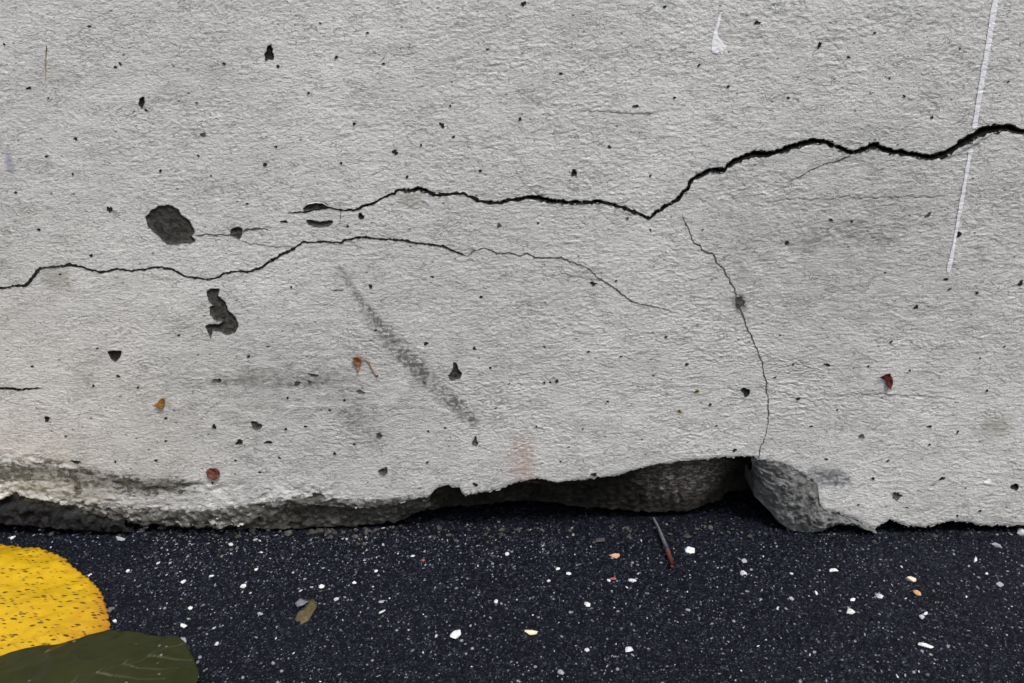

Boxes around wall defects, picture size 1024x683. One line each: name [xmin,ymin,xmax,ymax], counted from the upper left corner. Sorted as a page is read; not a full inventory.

peeling [145,205,196,245]
peeling [205,289,238,338]
crack [0,123,1024,458]
spalling [0,449,877,534]